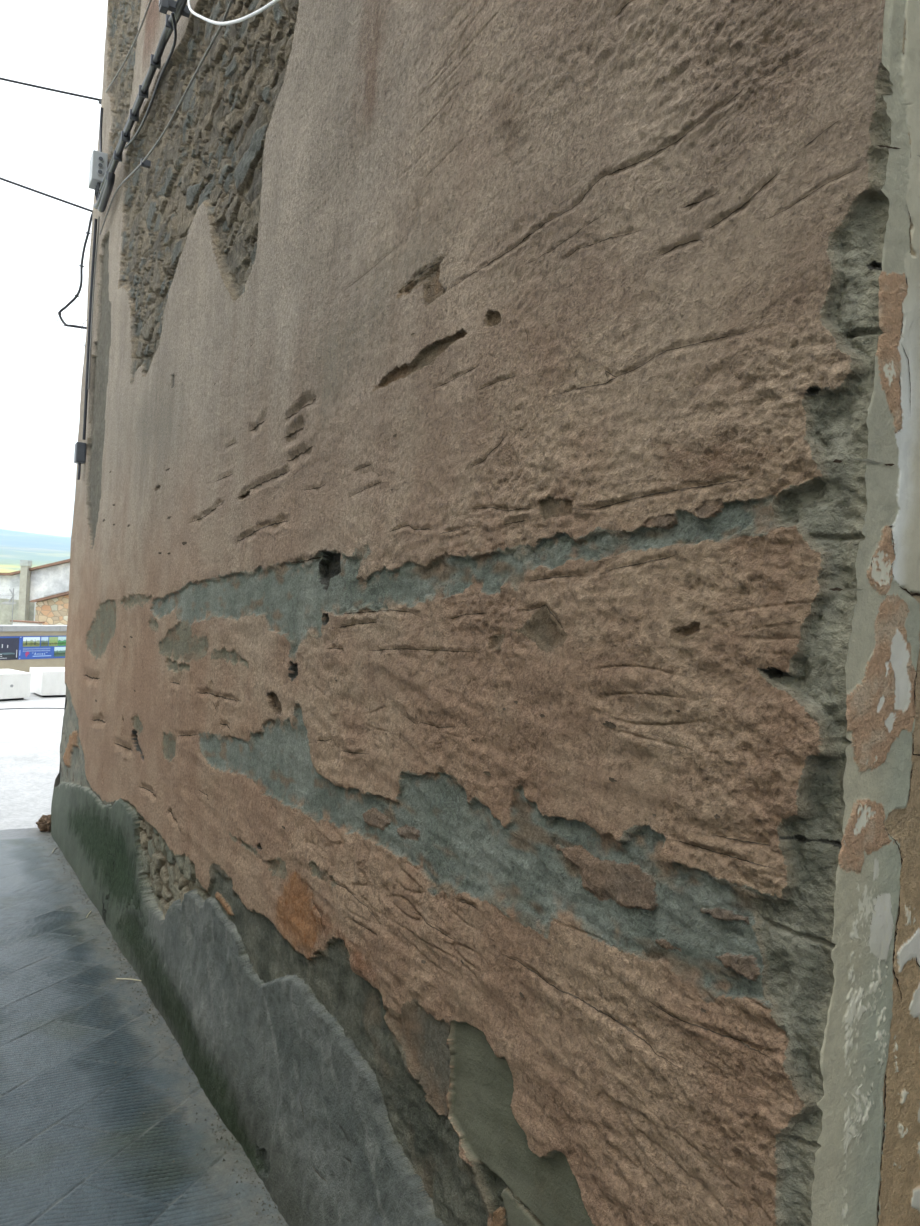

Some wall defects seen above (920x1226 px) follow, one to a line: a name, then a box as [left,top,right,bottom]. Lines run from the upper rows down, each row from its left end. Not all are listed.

crack [403,17,863,291]
spalling [86,0,299,549]
crack [432,365,514,391]
spalling [151,0,920,880]
crack [543,322,777,399]
spalling [86,599,116,660]
spalling [60,683,595,1226]
spalling [199,702,842,1226]
peeling [843,884,899,1078]
peeling [897,905,920,973]
peeling [909,983,920,1020]
peeling [911,1186,920,1212]